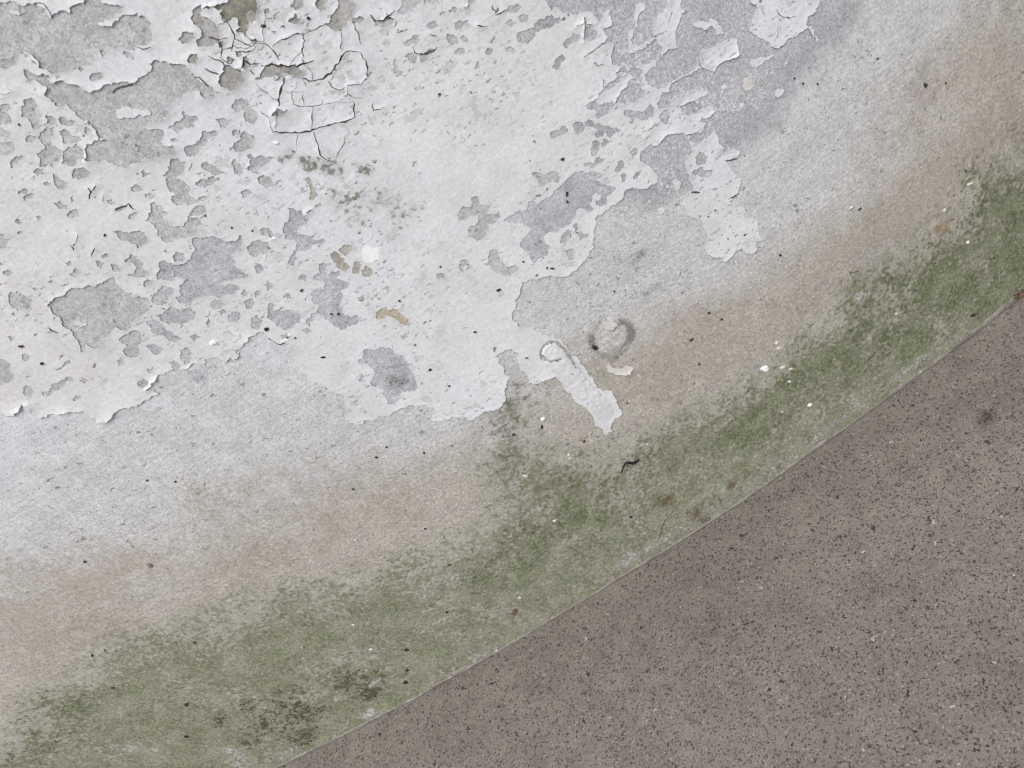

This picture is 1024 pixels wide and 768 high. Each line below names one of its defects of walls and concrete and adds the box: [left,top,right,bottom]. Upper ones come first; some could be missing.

peeling [0,0,476,396]
crack [195,10,437,164]
peeling [457,0,850,276]
peeling [358,347,417,405]
peeling [606,364,634,376]